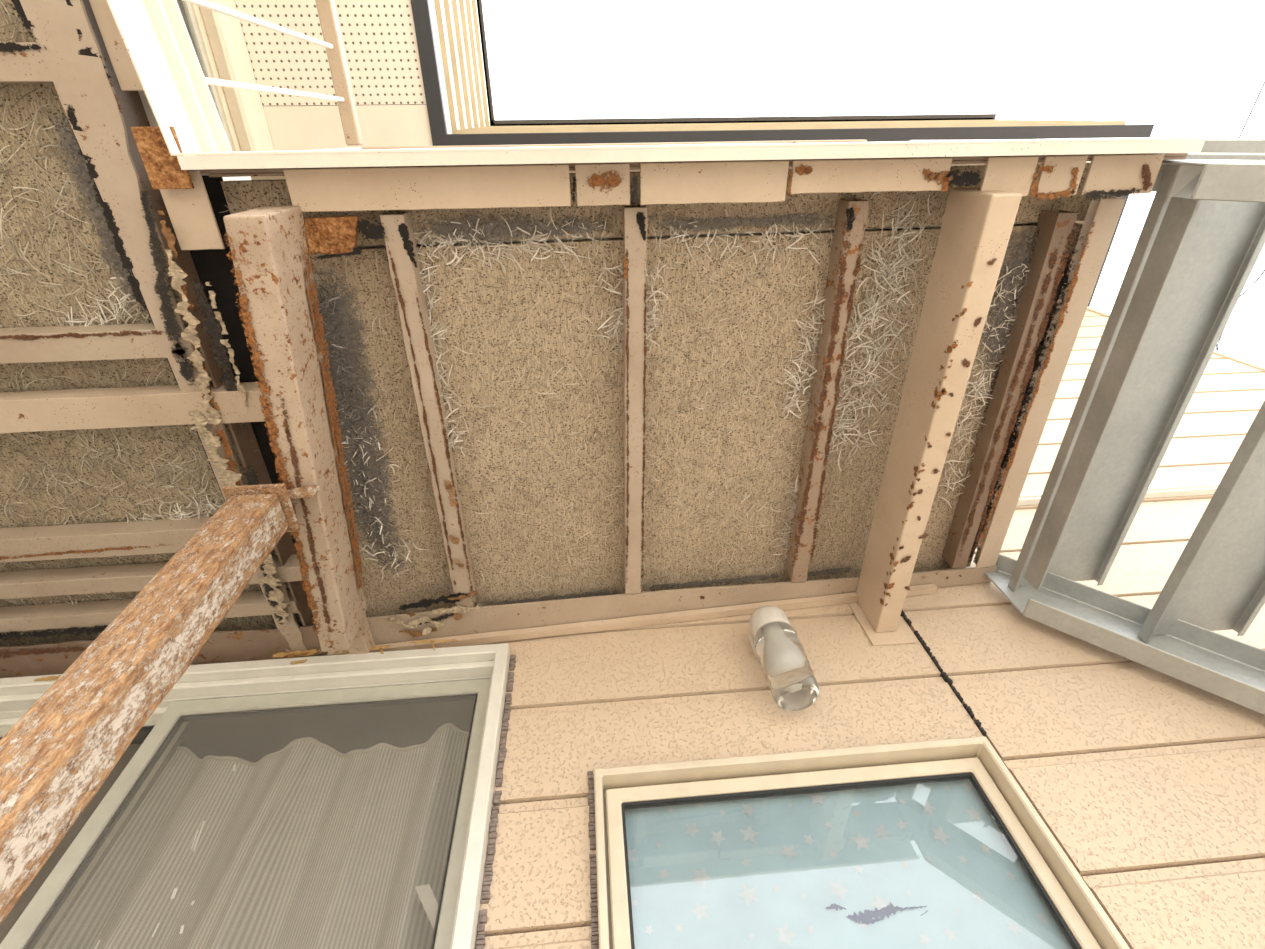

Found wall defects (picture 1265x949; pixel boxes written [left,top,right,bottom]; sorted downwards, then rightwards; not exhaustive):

corrosion [0,0,47,53]
corrosion [923,169,982,192]
corrosion [1030,164,1152,201]
corrosion [0,104,349,653]
corrosion [300,230,367,606]
corrosion [385,220,473,597]
corrosion [572,170,647,583]
corrosion [792,207,866,566]
corrosion [930,340,971,410]
corrosion [960,222,1095,558]
corrosion [0,625,108,659]
peeling [389,590,480,637]